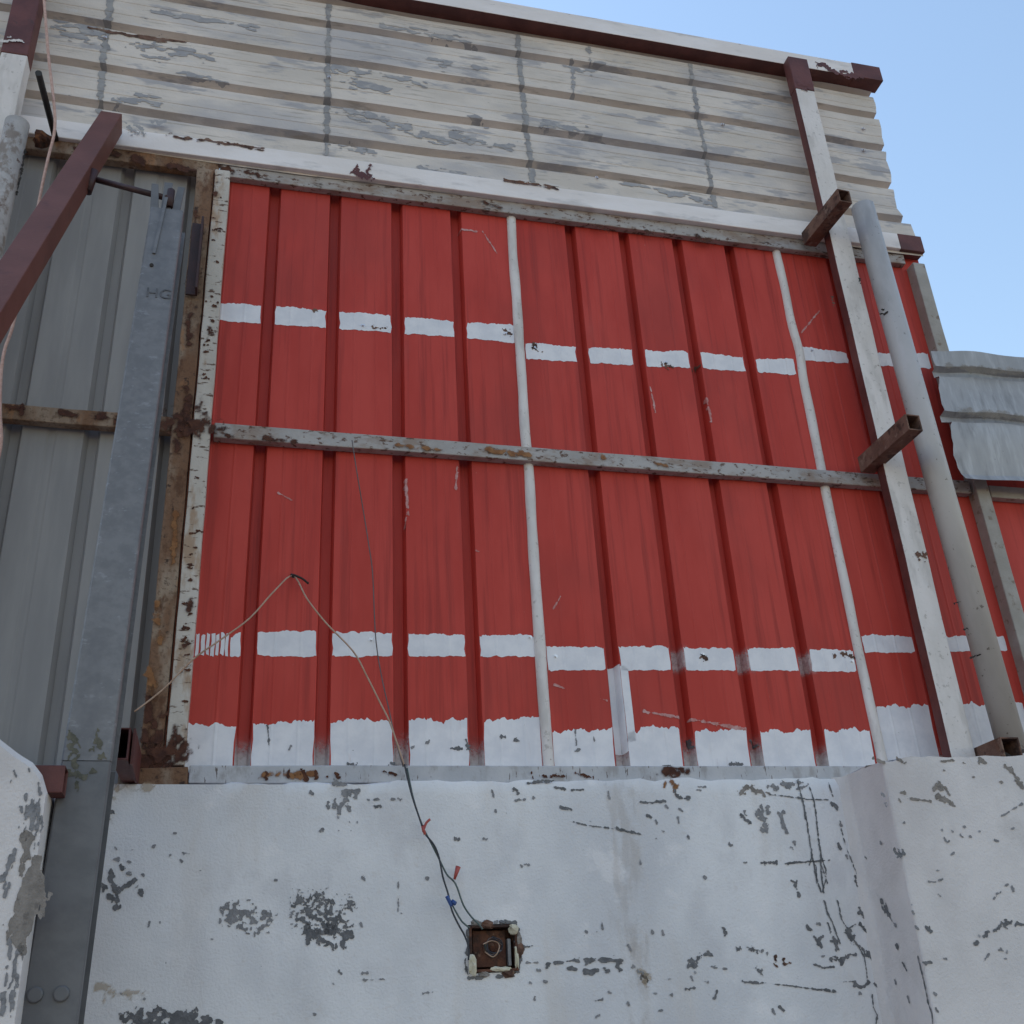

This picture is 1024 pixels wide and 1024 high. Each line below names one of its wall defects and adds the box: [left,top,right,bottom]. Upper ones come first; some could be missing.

rust [160,385,234,454]
rust [181,598,194,672]
rust [139,666,199,768]
rust [261,768,341,782]
rust [661,766,690,792]
peeling [737,779,809,865]
peeling [0,782,53,1018]
peeling [219,888,363,951]
peeling [736,945,792,984]
crack [769,782,878,1024]
peeling [806,907,872,969]
peeling [119,997,224,1024]